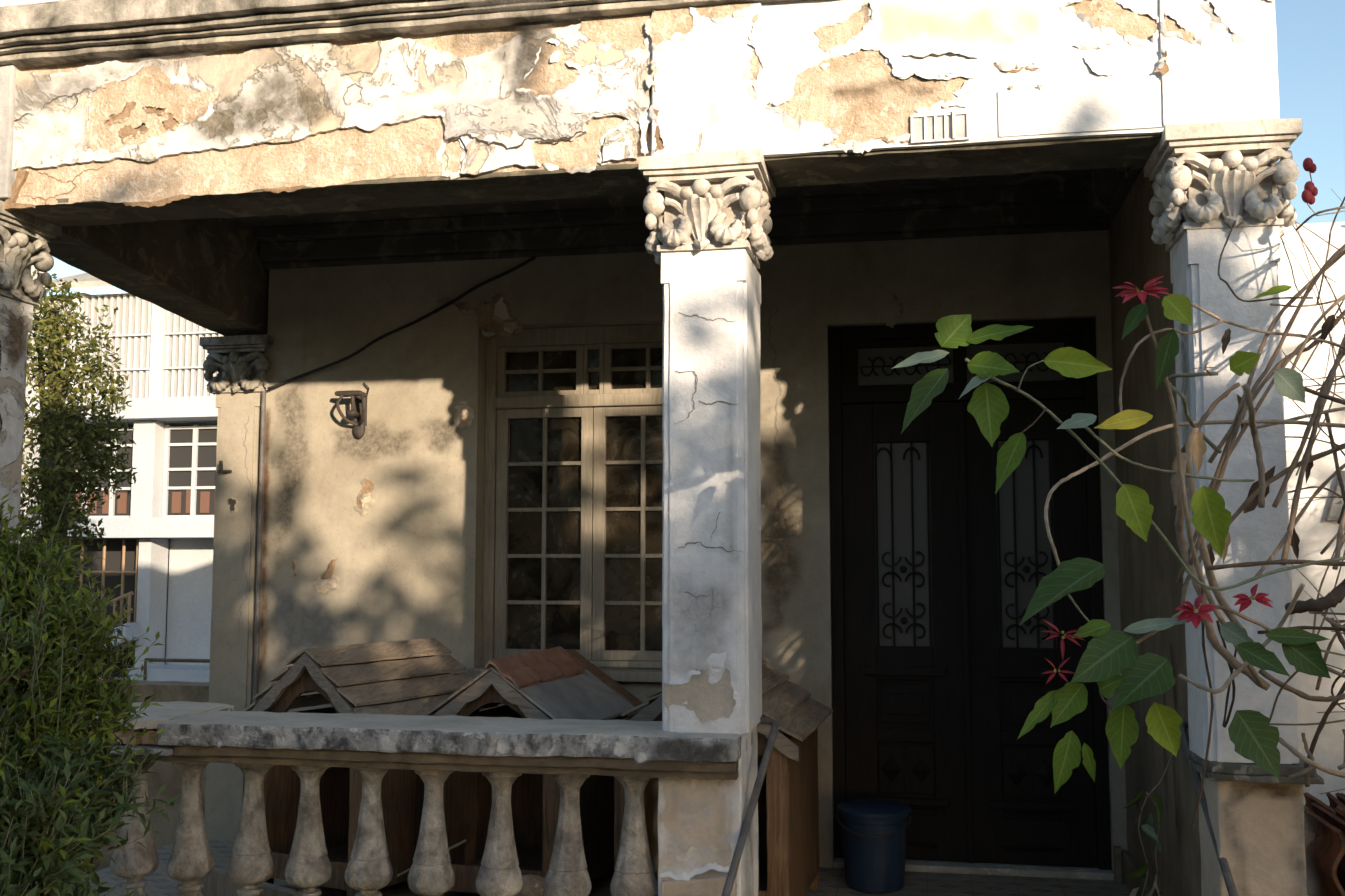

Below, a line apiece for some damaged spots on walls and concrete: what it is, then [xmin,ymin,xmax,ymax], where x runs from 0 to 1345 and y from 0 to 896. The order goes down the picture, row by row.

peeling [1058,0,1245,75]
peeling [515,38,580,100]
peeling [578,0,987,156]
flaking render [4,65,467,211]
flaking render [532,116,628,174]
flaking render [354,477,376,516]
flaking render [312,574,340,596]
peeling [663,668,742,724]
flaking render [659,861,738,896]